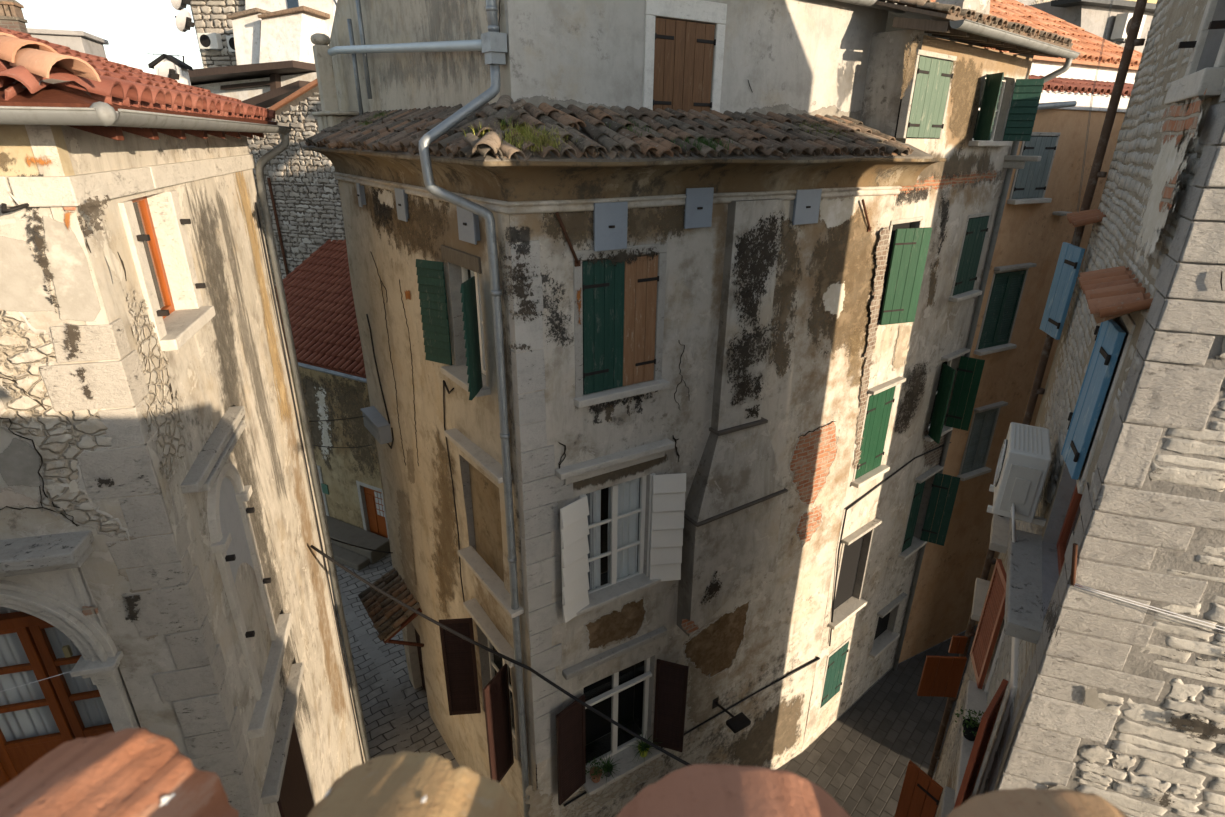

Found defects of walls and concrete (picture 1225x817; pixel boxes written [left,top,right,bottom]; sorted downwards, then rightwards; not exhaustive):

water stain [21,207,60,313]
flaking render [127,287,189,490]
water stain [502,205,685,349]
crack [673,343,689,462]
water stain [726,207,879,419]
flaking render [853,225,891,469]
flaking render [893,322,911,371]
water stain [895,362,928,433]
crack [0,486,77,526]
flaking render [788,420,838,547]
flaking render [584,597,647,651]
flaking render [681,600,751,728]